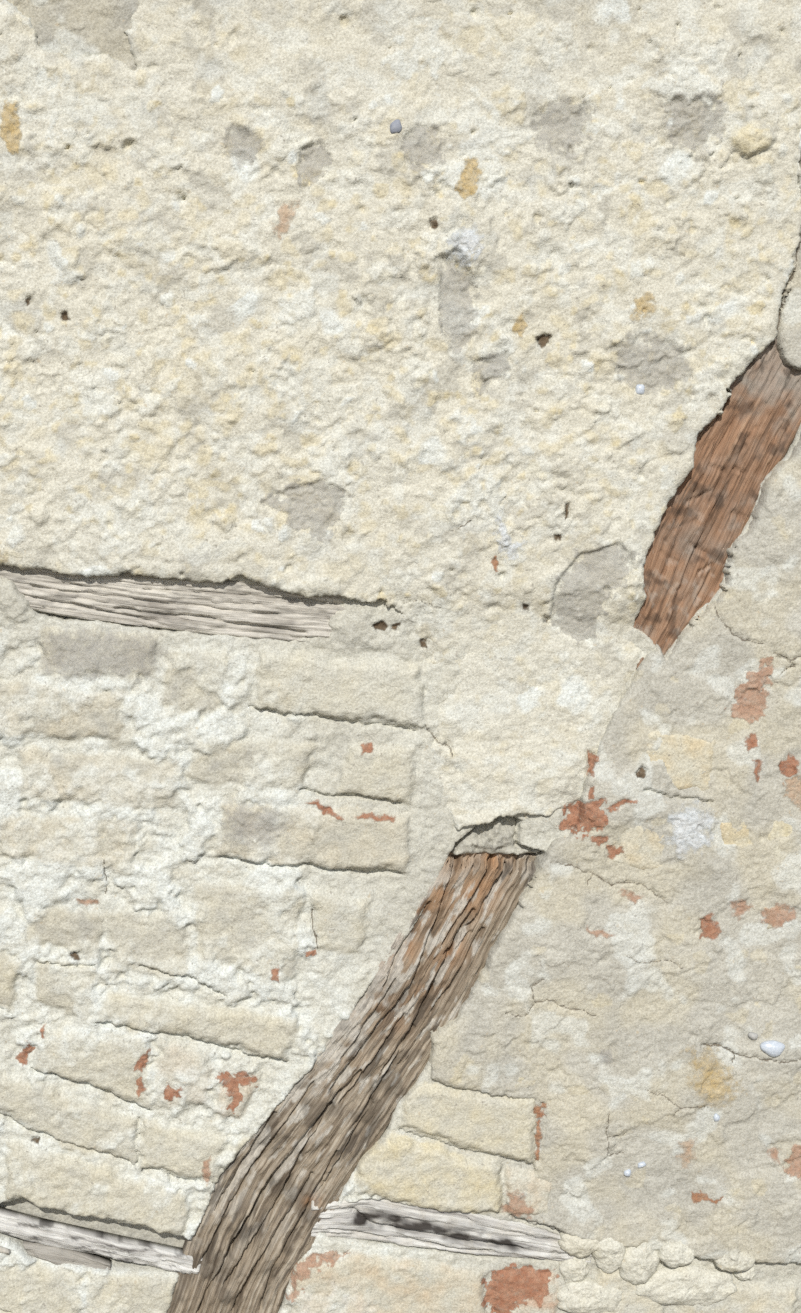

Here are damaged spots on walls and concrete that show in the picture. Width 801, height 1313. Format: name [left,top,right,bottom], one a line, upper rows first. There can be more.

crack [775,234,801,338]
spalling [613,333,690,393]
crack [715,607,801,671]
crack [565,864,668,903]
crack [505,979,596,1017]
crack [705,1043,800,1063]